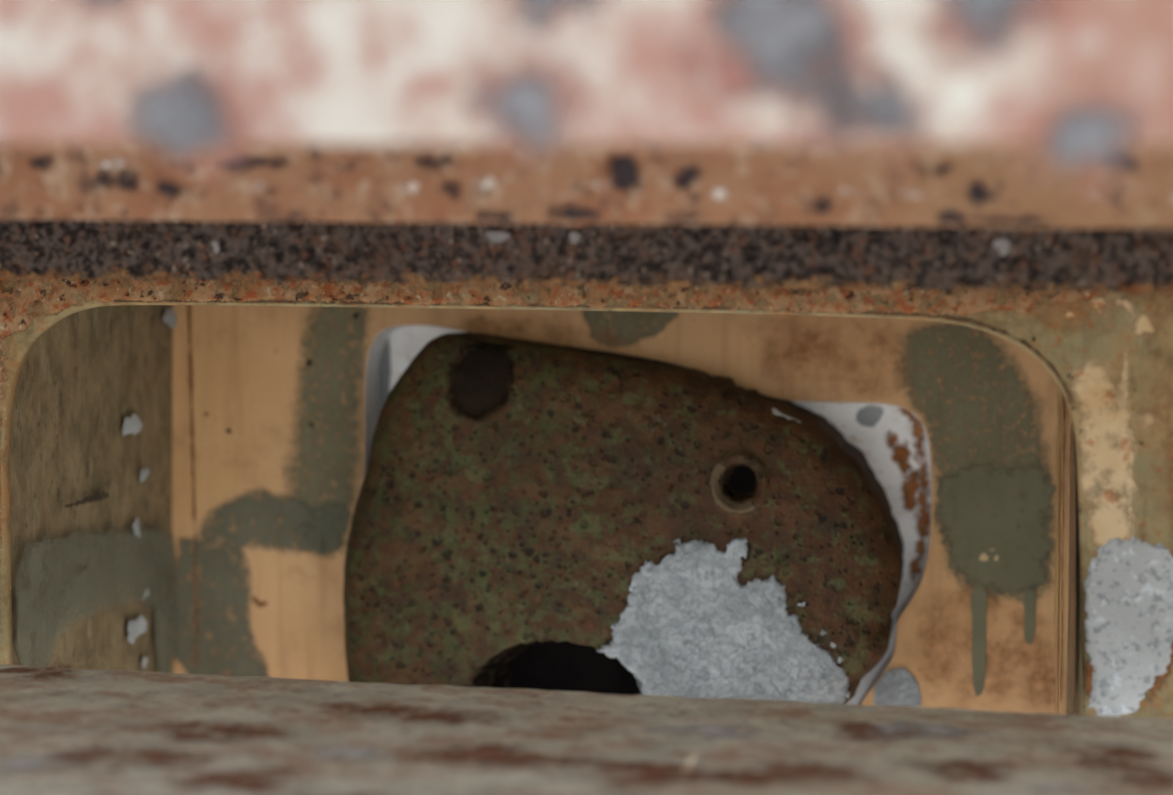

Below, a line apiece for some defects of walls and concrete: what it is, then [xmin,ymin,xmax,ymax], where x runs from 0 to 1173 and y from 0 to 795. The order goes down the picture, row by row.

rust [0,268,1173,715]
spalling [856,405,884,427]
peeling [597,538,850,704]
peeling [873,668,922,707]